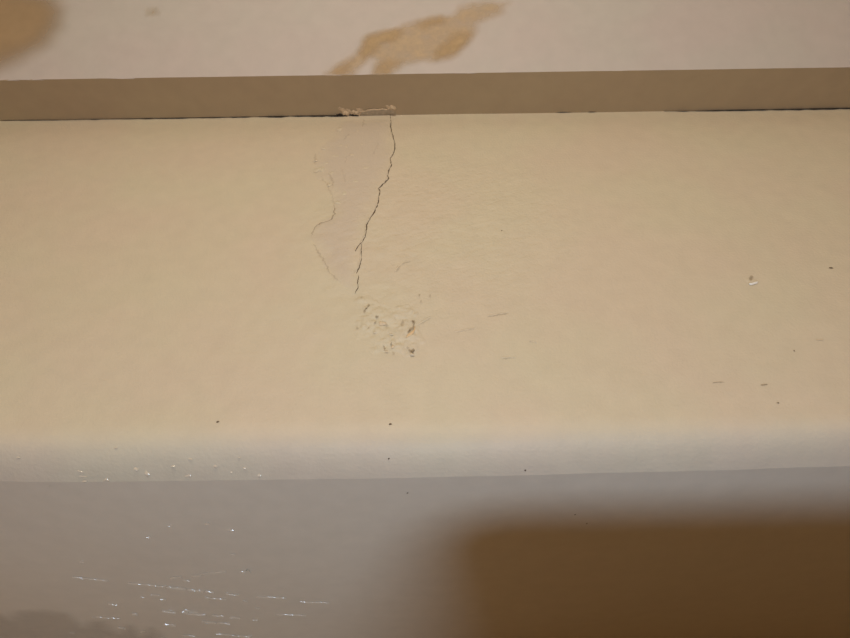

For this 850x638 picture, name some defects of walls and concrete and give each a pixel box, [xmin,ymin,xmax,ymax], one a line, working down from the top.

water stain [334,5,498,74]
crack [354,115,395,293]